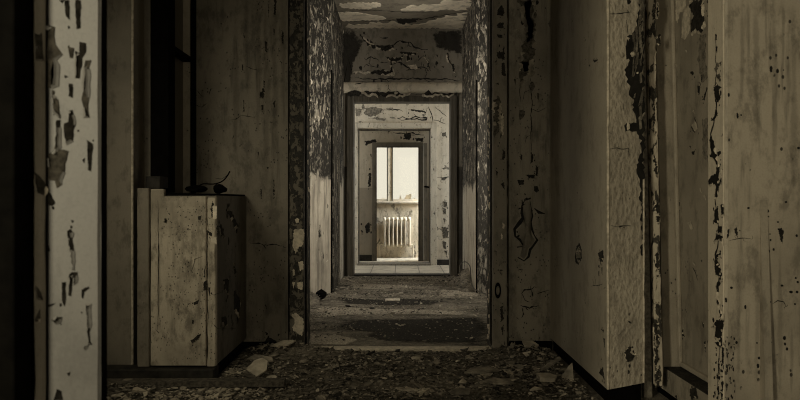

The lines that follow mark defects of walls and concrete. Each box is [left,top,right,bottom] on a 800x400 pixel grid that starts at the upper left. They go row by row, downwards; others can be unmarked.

peeling [34,25,91,209]
peeling [59,0,81,29]
peeling [82,140,94,171]
peeling [310,0,487,143]
peeling [497,0,539,100]
flaking render [619,0,660,256]
peeling [675,0,740,400]